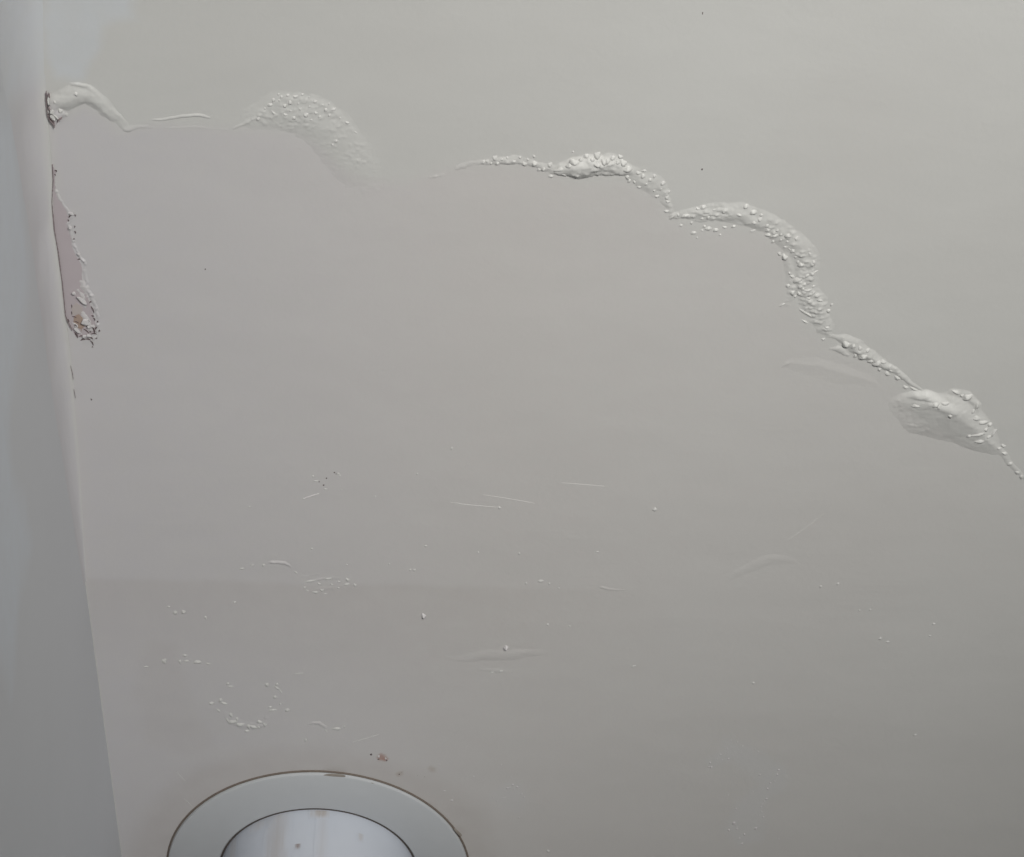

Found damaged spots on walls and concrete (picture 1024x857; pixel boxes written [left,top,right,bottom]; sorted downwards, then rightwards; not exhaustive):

peeling [52,164,100,347]